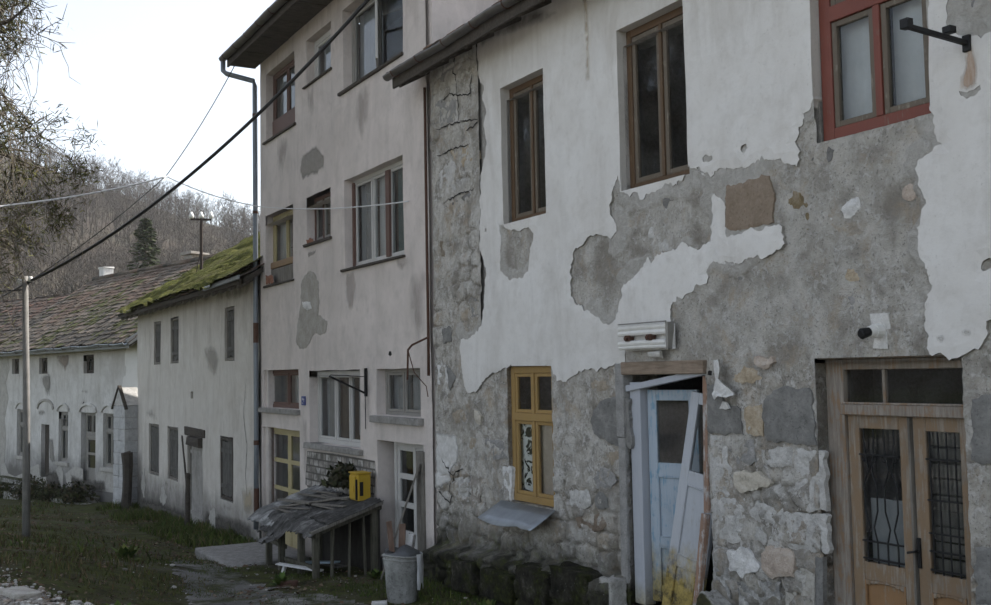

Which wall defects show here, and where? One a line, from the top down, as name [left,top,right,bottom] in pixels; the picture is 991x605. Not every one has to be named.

spalling [946,0,991,38]
crack [436,57,478,156]
spalling [430,44,487,351]
spalling [571,75,941,337]
spalling [499,223,533,280]
spalling [296,271,327,349]
flaking render [437,363,456,391]